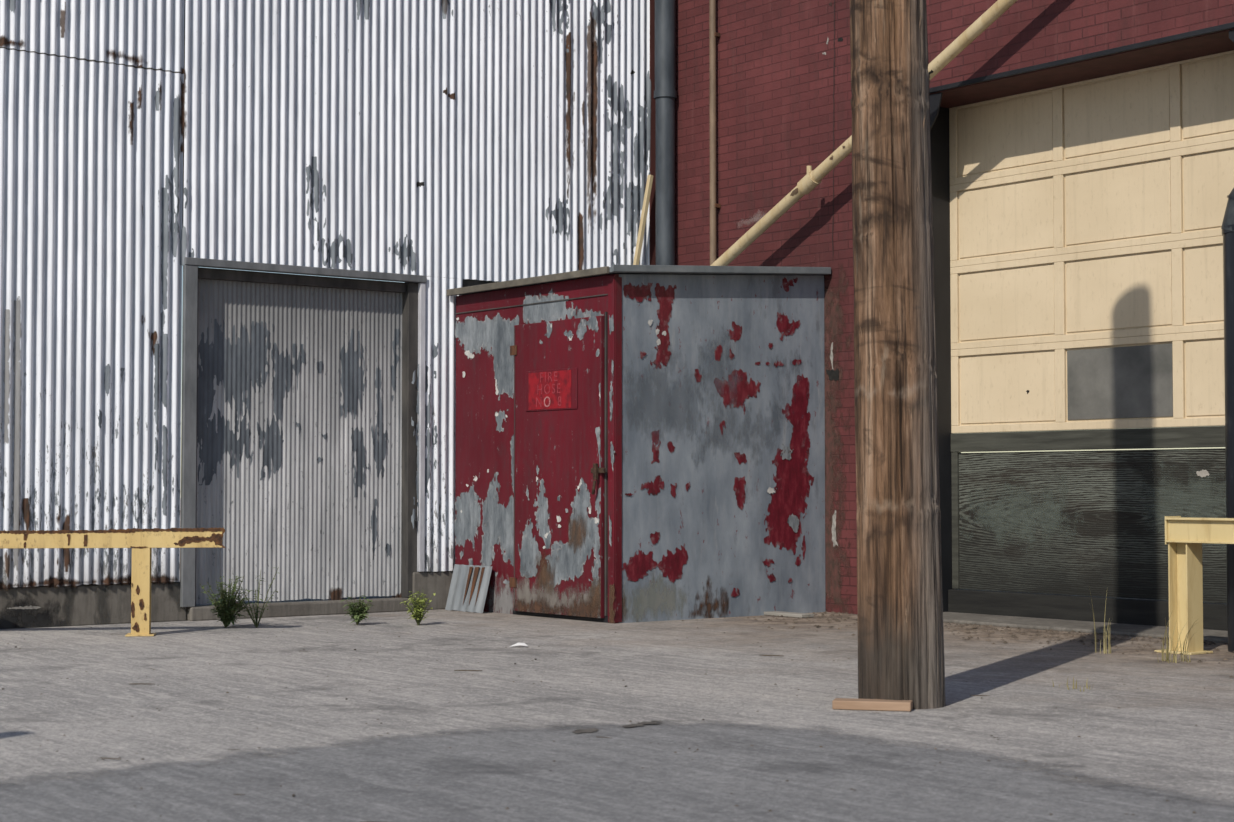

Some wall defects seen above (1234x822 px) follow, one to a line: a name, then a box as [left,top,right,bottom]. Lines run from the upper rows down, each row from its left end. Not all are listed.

corrosion [0,36,23,47]
corrosion [107,51,142,67]
corrosion [129,84,142,142]
peeling [589,0,651,265]
peeling [545,195,570,240]
peeling [197,319,323,485]
peeling [338,329,400,560]
peeling [411,343,438,529]
peeling [454,282,690,624]
peeling [694,267,851,613]
corrosion [0,498,225,632]
corrosion [330,588,356,600]